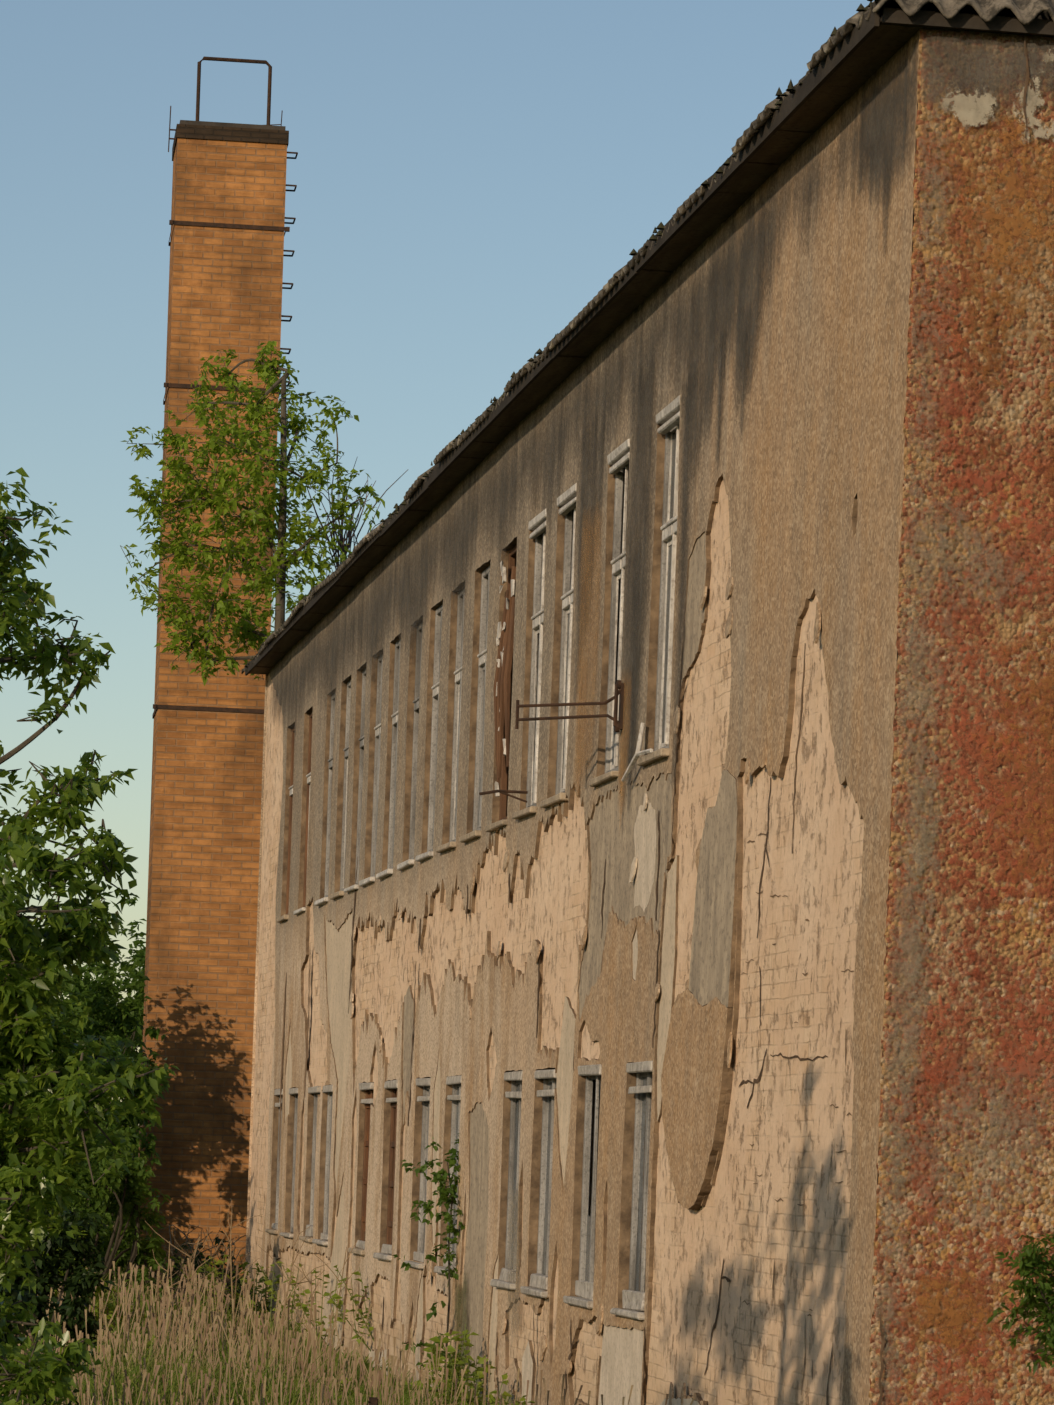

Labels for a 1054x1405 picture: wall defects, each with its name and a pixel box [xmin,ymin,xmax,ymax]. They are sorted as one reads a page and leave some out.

leakage [839,35,1054,210]
peeling [943,77,1054,141]
leakage [272,150,820,796]
flaking render [246,479,864,1405]
leakage [883,629,930,1206]